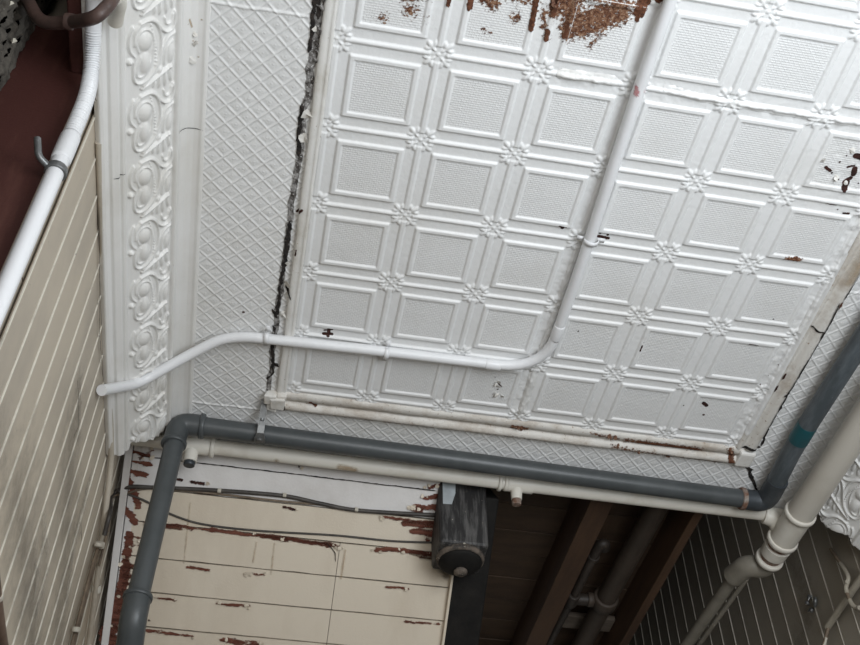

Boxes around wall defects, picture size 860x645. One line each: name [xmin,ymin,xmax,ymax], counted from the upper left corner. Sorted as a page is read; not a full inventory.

rust [373,0,429,24]
rust [466,0,663,50]
crack [266,0,325,391]
crack [742,275,860,490]
peeling [98,447,155,645]
peeling [165,523,344,551]
peeling [371,483,440,559]
peeling [146,619,194,639]
peeling [219,637,264,645]